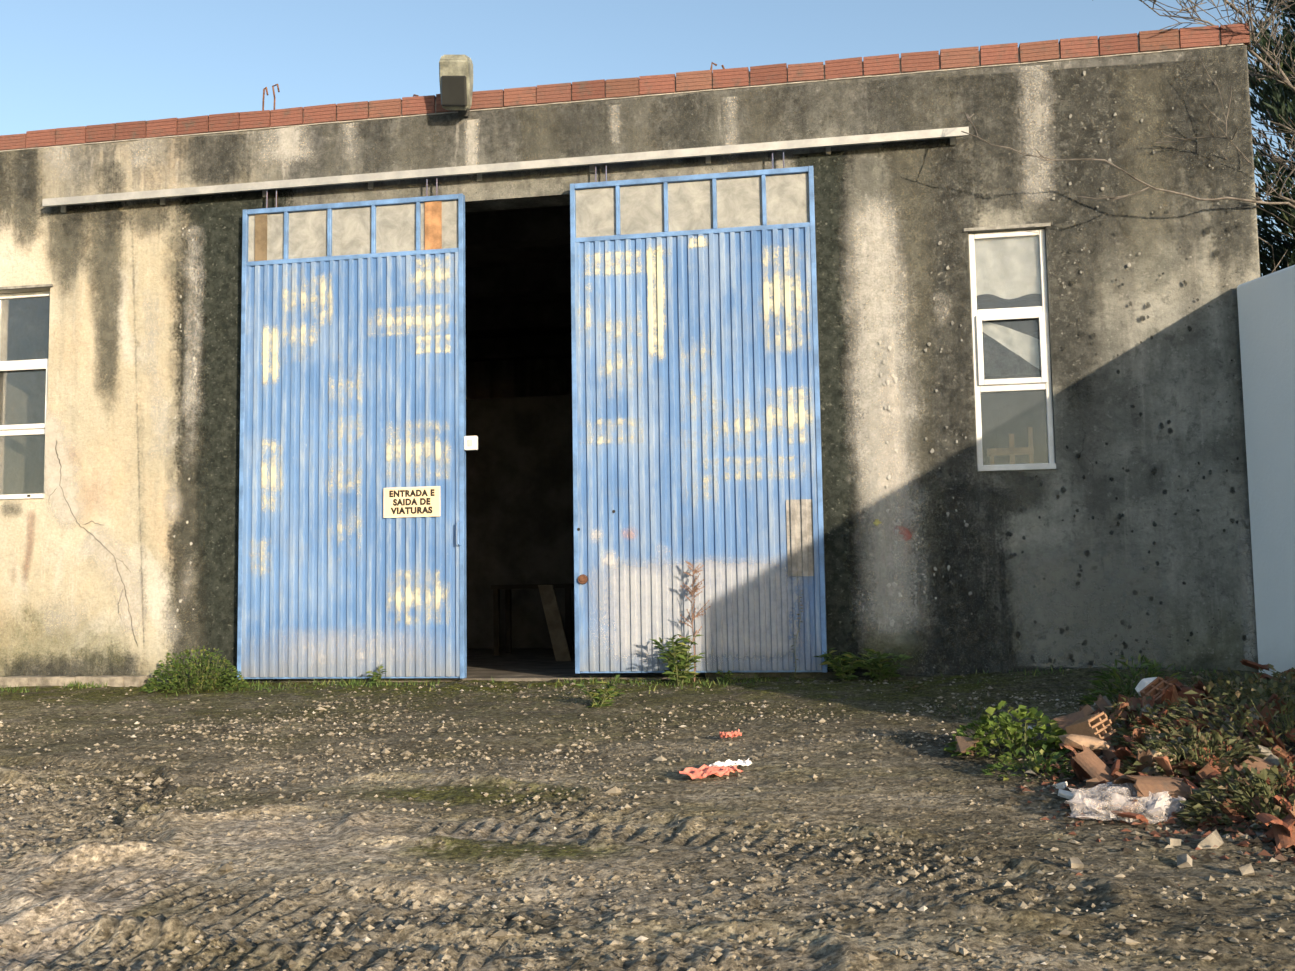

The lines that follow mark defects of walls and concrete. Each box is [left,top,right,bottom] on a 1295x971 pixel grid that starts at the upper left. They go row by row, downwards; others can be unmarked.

leakage [270,126,309,160]
leakage [337,118,437,173]
leakage [466,85,820,178]
peeling [262,325,314,383]
peeling [378,305,450,354]
peeling [595,247,664,358]
peeling [763,248,808,350]
leakage [794,46,1258,677]
leakage [0,134,294,684]
peeling [723,389,812,442]
crack [49,441,137,643]
peeling [389,572,447,623]